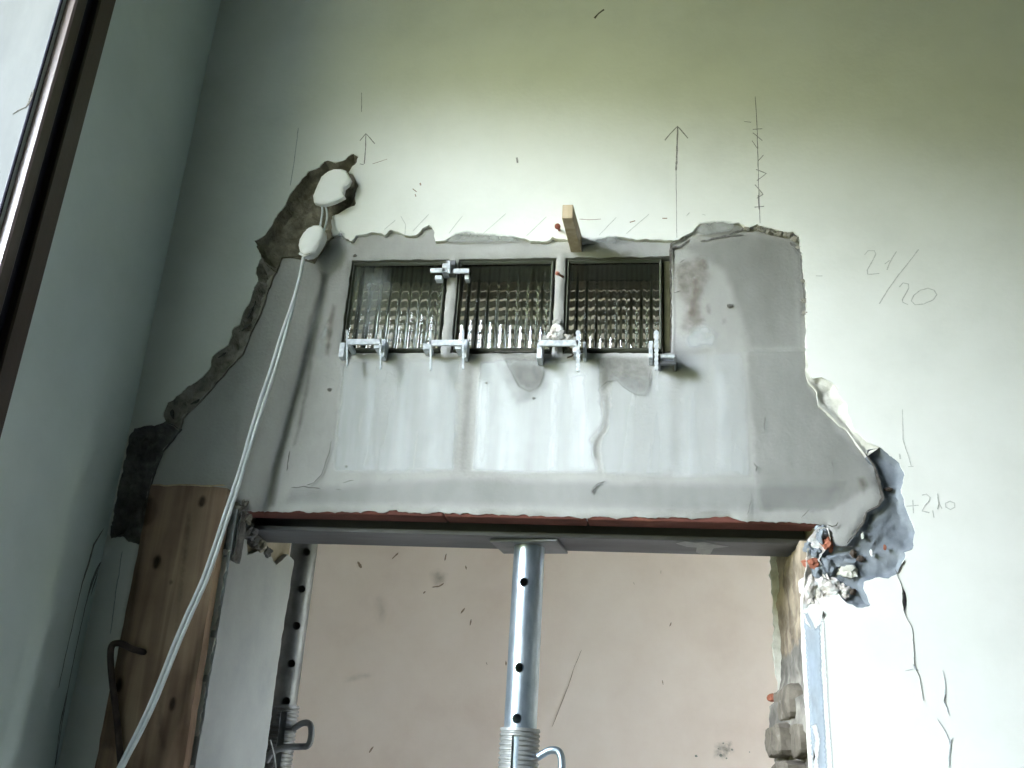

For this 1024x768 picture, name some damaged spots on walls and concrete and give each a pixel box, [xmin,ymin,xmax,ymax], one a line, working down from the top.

flaking render [672,225,807,316]
flaking render [110,252,277,545]
leakage [483,357,544,470]
flaking render [223,511,246,564]
flaking render [765,356,915,768]
crack [895,560,953,766]